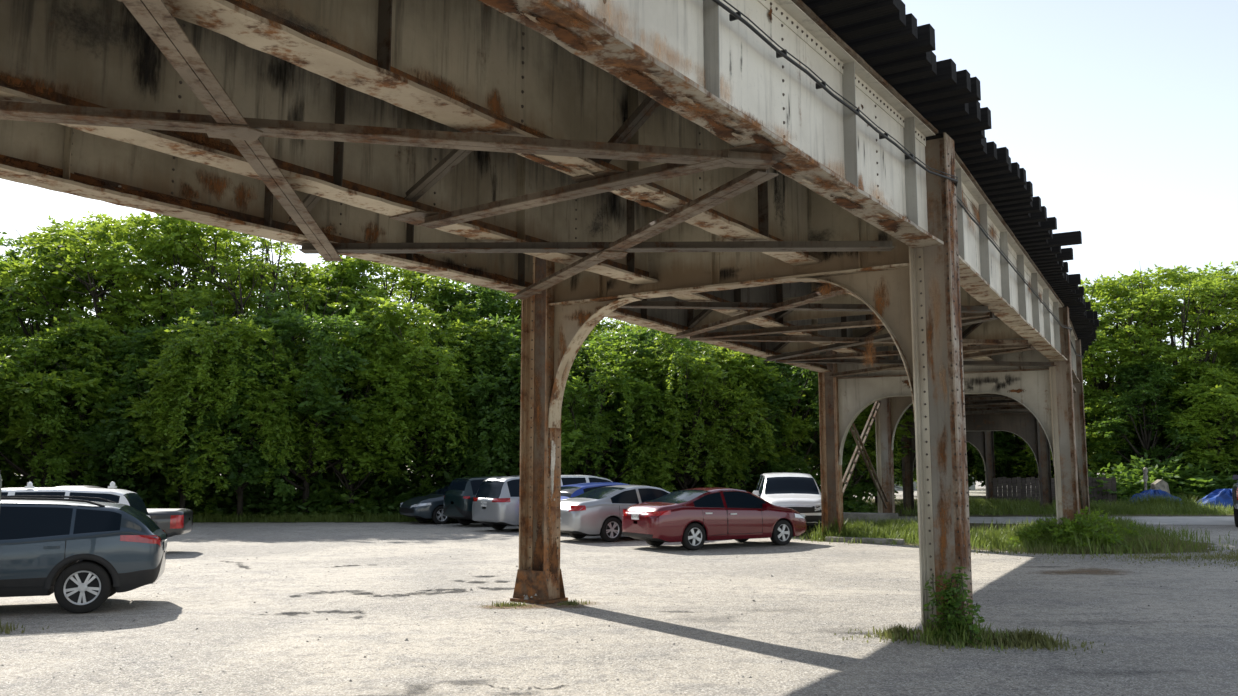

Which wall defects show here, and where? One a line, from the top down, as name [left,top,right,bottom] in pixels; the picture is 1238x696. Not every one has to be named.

damp [61,10,157,91]
rust [287,14,350,53]
rust [417,73,465,103]
rust [183,173,251,210]
rust [572,305,618,326]
rust [926,310,934,380]
rust [950,153,996,413]
rust [533,377,559,580]
rust [937,466,966,609]